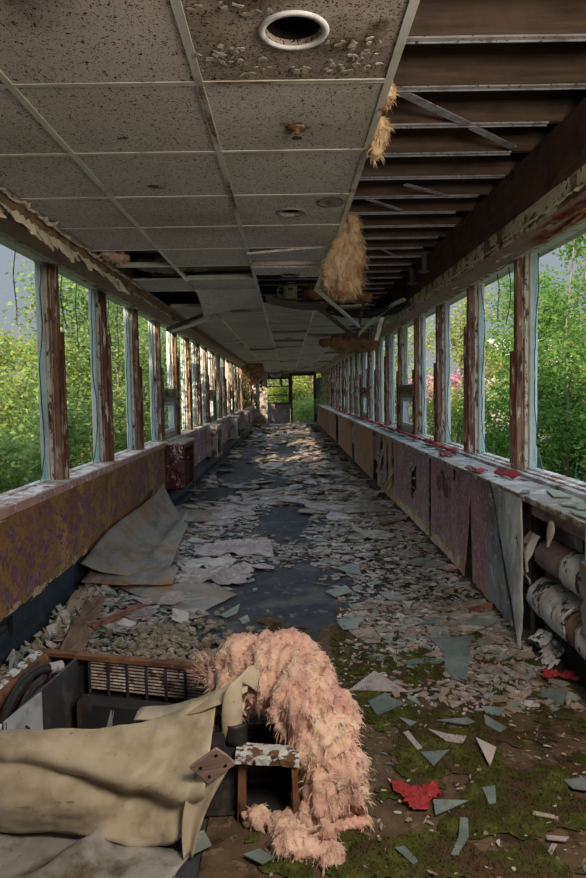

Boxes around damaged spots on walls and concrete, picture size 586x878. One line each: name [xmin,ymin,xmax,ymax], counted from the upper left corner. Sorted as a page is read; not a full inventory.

peeling [219,1,273,16]
peeling [193,44,271,77]
peeling [323,36,383,73]
peeling [392,182,586,325]
peeling [0,187,203,424]
peeling [0,291,184,621]
peeling [397,498,459,569]